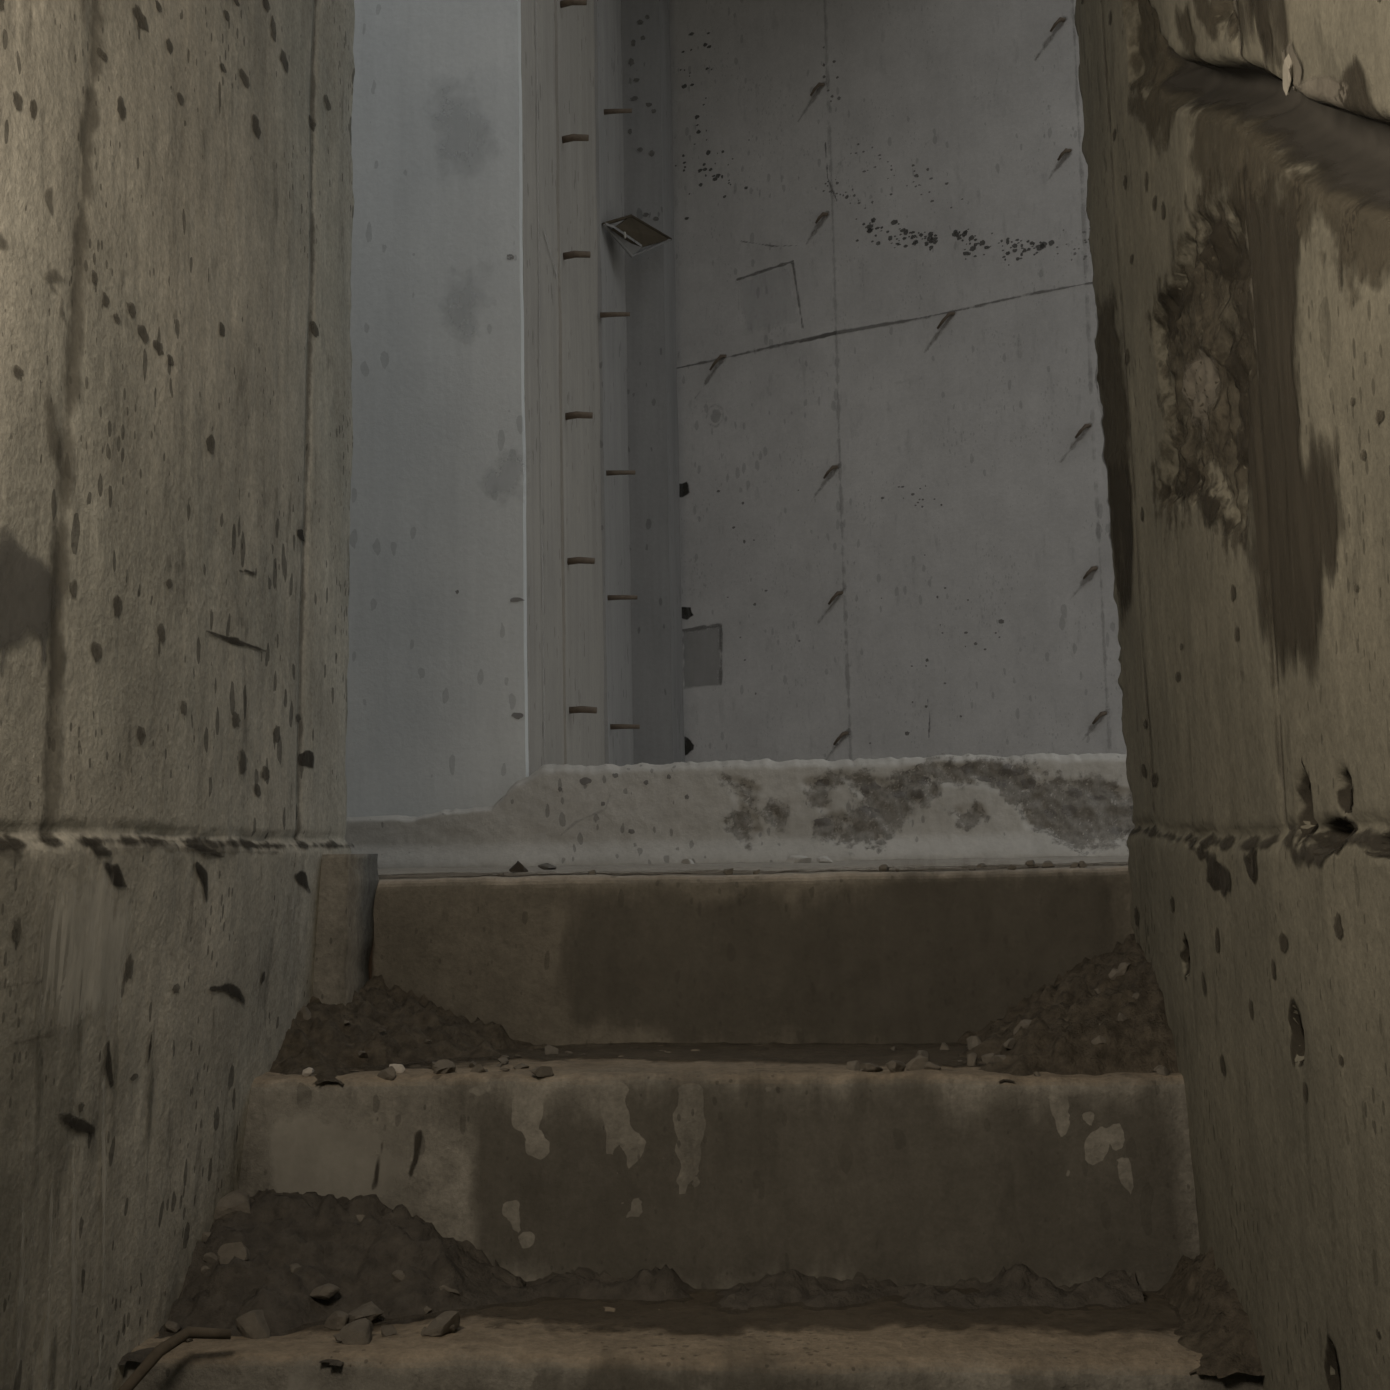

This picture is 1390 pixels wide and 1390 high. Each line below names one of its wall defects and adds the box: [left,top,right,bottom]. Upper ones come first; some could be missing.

leakage [1336,59,1390,124]
leakage [1127,72,1390,672]
leakage [0,535,64,689]
spalling [83,838,127,887]
spalling [187,844,224,902]
spalling [295,871,310,891]
spalling [124,954,134,982]
spalling [210,984,245,1004]